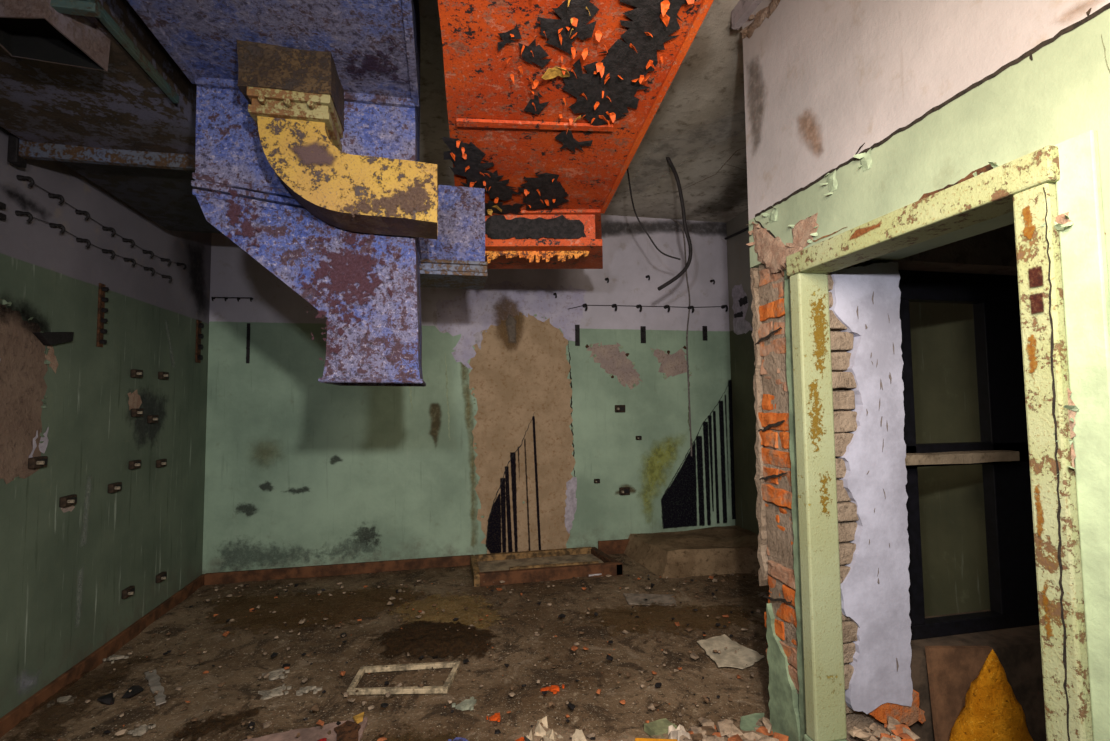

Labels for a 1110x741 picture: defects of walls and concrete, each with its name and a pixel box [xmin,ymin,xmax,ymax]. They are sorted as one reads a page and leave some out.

rust [210,186,273,254]
rust [291,142,334,165]
rust [323,176,436,217]
leakage [800,116,821,152]
crack [754,3,1110,248]
peeling [919,162,999,200]
rust [292,226,402,361]
peeling [0,299,59,484]
leakage [355,527,378,545]
peeling [464,312,576,554]
leakage [661,378,736,527]
flaking render [732,207,819,741]